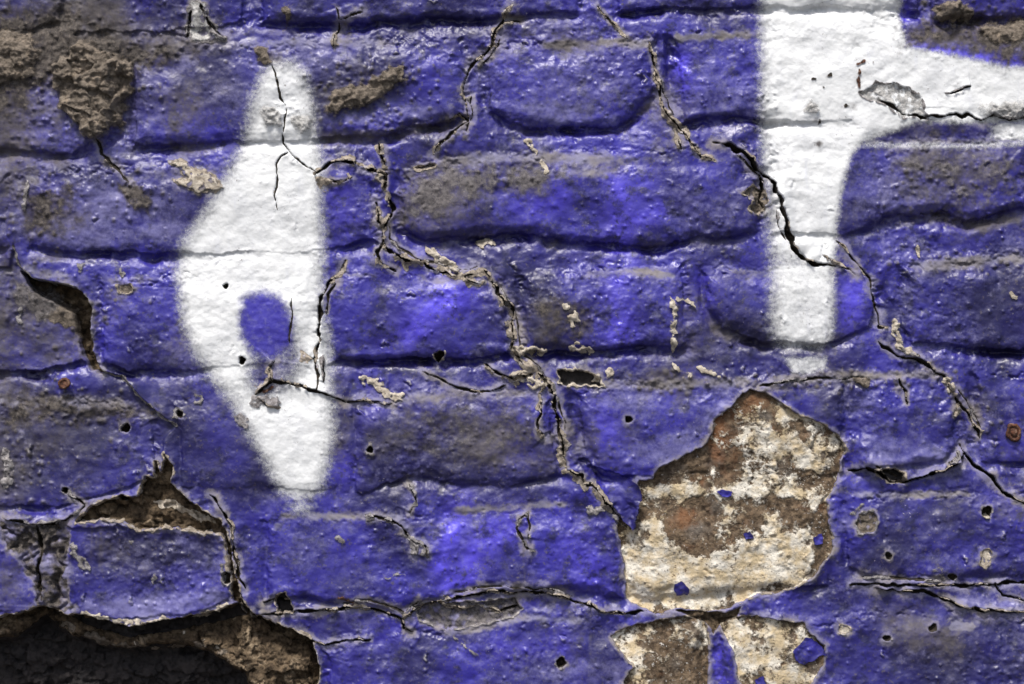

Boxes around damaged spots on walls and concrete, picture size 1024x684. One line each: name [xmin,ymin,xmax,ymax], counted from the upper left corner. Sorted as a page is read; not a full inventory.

crack [432,4,520,155]
spalling [858,80,929,121]
crack [254,66,619,516]
crack [597,6,1024,504]
spalling [0,451,321,684]
crack [209,484,647,645]
peeling [592,389,848,684]
crack [849,575,1024,613]